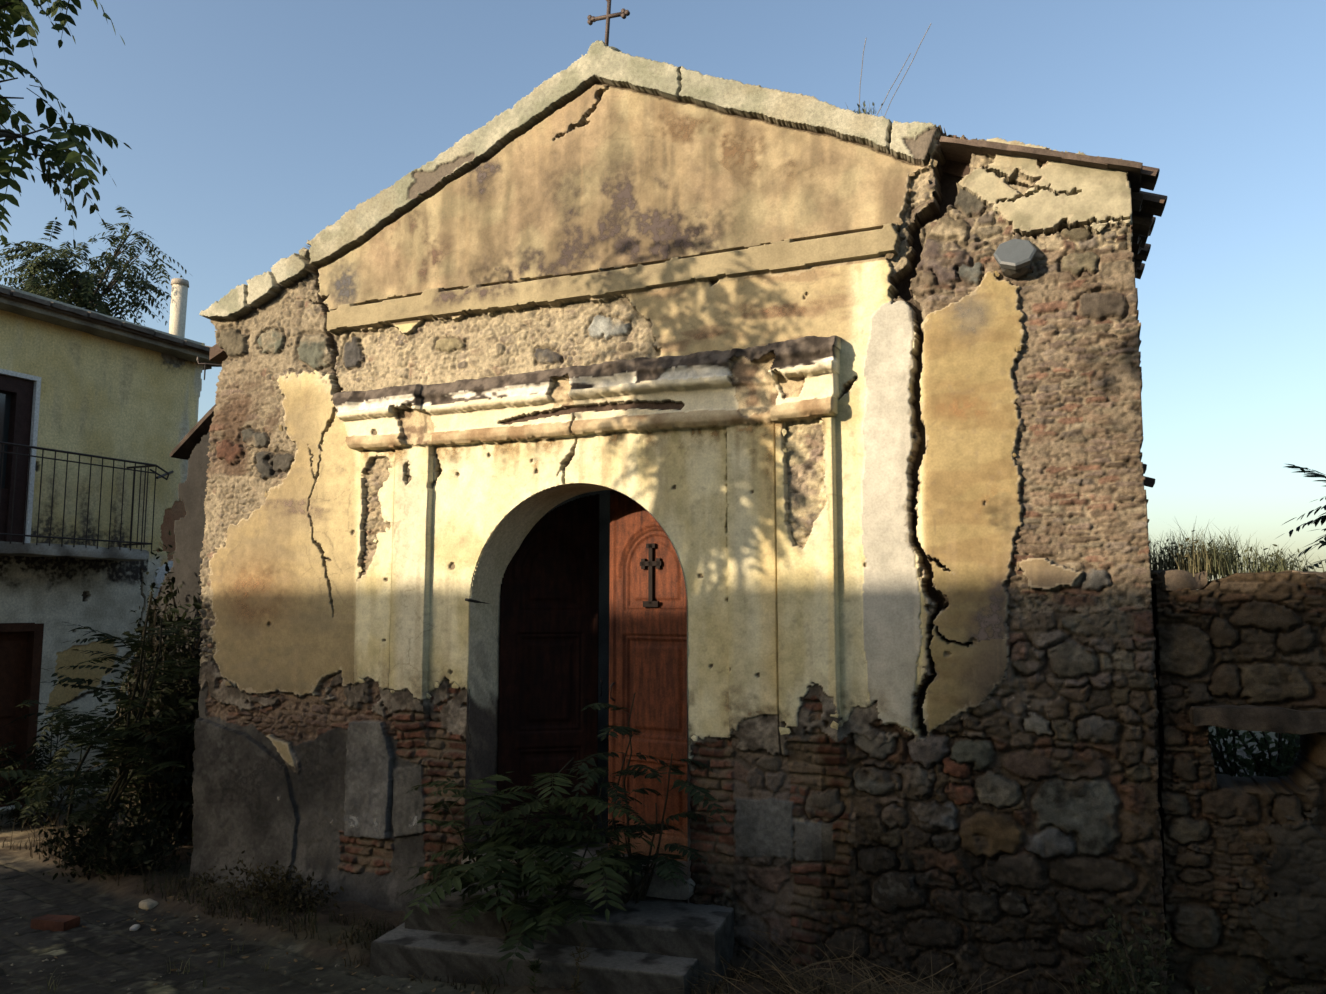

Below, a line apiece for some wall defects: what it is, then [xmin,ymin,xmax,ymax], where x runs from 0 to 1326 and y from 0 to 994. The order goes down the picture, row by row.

leakage [434,176,712,302]
crack [554,85,610,140]
crack [305,243,343,606]
flaking render [0,268,661,590]
crack [891,135,1130,644]
peeling [46,629,120,714]
flaking render [189,636,472,911]
crack [916,672,937,737]
crack [1152,583,1167,940]